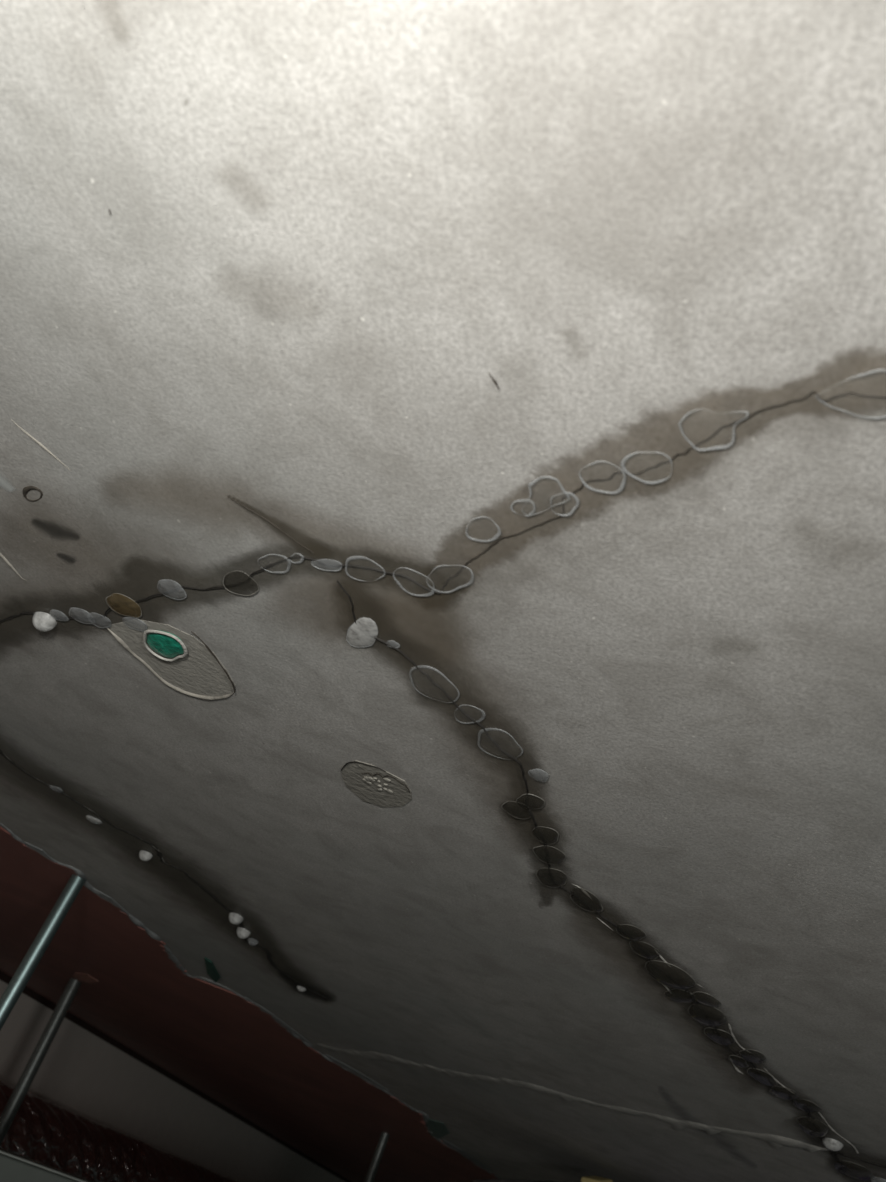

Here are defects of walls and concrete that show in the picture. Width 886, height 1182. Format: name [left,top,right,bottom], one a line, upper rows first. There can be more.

spalling [340,760,412,808]
leakage [0,357,886,1182]
crack [0,391,886,1182]